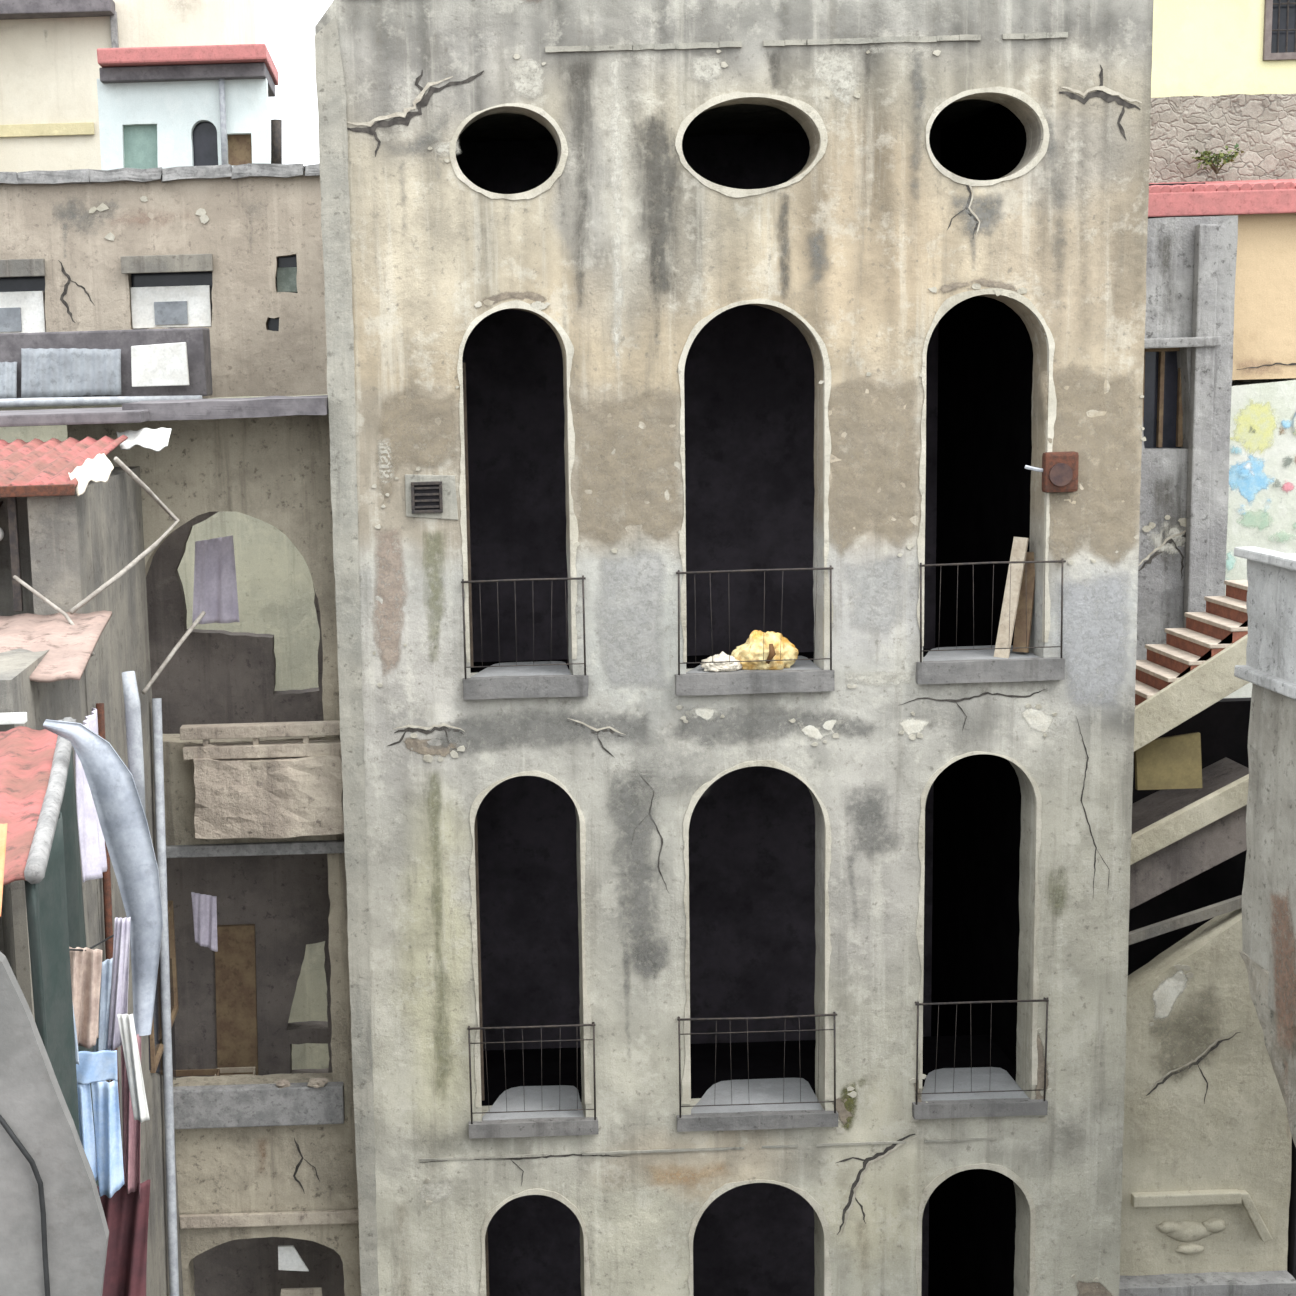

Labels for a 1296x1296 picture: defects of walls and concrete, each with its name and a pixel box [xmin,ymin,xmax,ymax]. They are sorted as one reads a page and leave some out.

crack [347,70,484,157]
crack [1059,65,1142,139]
leakage [642,116,677,291]
crack [947,178,980,241]
crack [58,260,95,323]
flaking render [405,733,465,762]
leakage [849,798,894,853]
crack [1076,717,1109,894]
flaking render [1149,964,1194,1026]
crack [1146,1029,1240,1104]
crack [836,1134,917,1236]
flaking render [1071,1274,1112,1296]